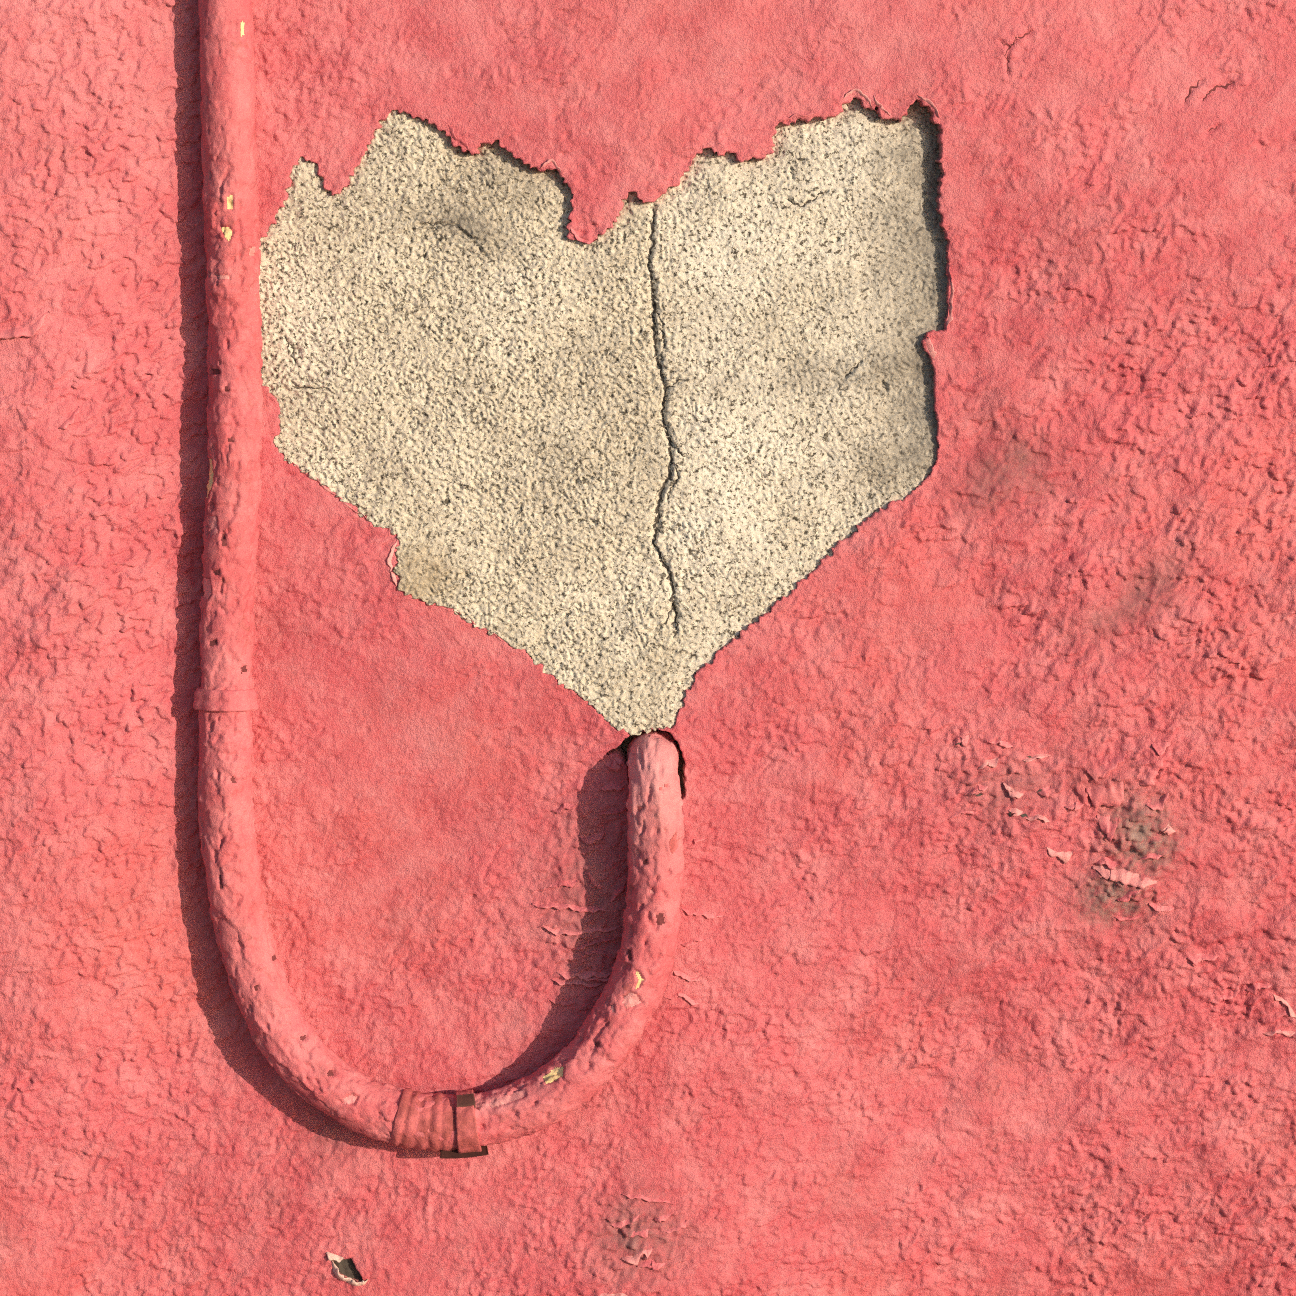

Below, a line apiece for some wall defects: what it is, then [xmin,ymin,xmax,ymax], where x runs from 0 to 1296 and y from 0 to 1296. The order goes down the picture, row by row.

spalling [249,88,955,736]
crack [647,208,687,638]
peeling [948,740,1051,823]
peeling [1046,847,1073,864]
spalling [1064,739,1176,921]
peeling [532,871,644,1012]
peeling [326,1252,369,1286]